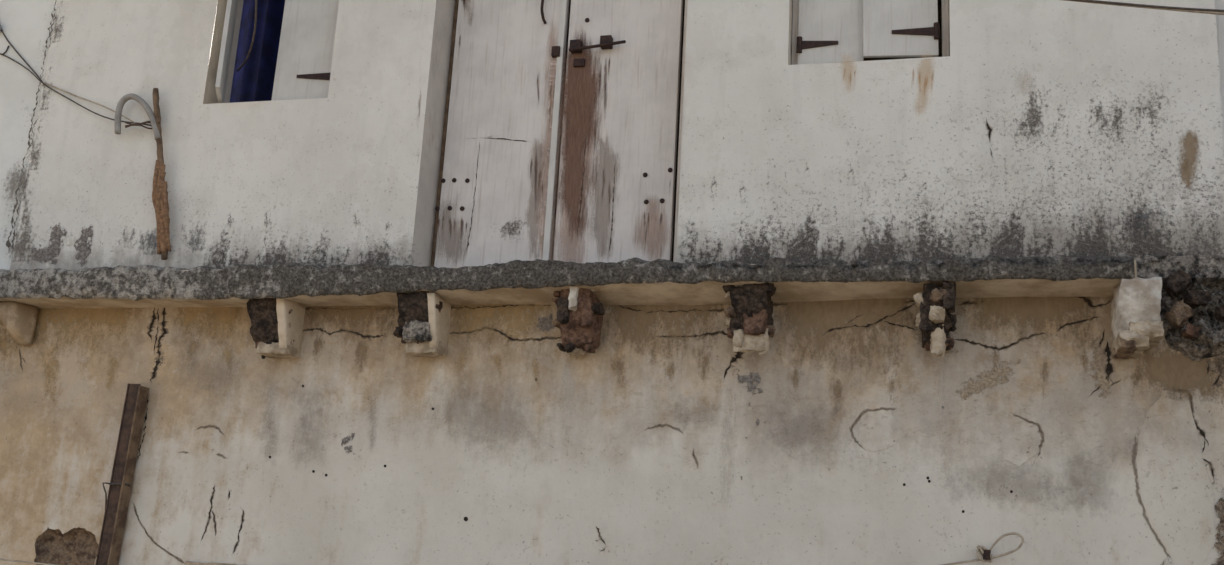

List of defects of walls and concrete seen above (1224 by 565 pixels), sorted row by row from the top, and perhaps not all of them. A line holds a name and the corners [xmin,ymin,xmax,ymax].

crack [3,2,62,261]
water stain [680,197,1224,264]
crack [137,308,167,461]
crack [303,308,396,339]
crack [449,305,561,344]
crack [822,300,916,336]
crack [954,297,1120,396]
spalling [1160,255,1224,380]
crack [1176,360,1221,482]
spalling [34,527,99,565]
crack [186,426,244,551]
spalling [1211,498,1224,565]